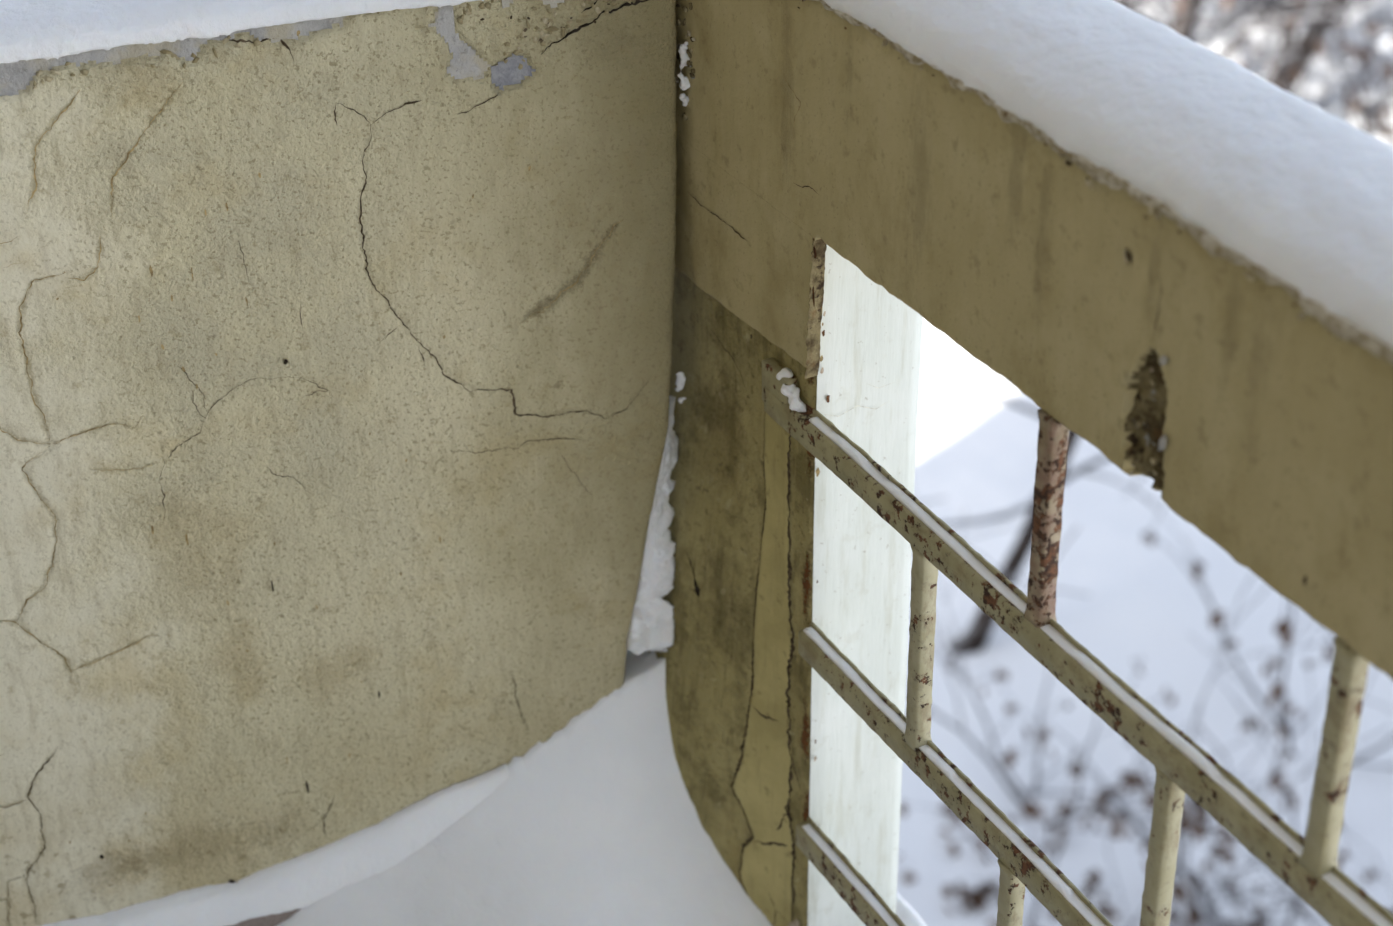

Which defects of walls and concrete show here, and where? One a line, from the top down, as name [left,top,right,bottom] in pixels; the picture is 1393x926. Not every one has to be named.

crack [229,38,294,61]
peeling [428,0,636,91]
crack [541,0,648,55]
peeling [676,3,696,91]
spalling [798,0,1393,364]
crack [334,100,647,496]
crack [0,237,156,677]
crack [93,365,329,526]
crack [731,432,800,926]
crack [0,747,58,924]